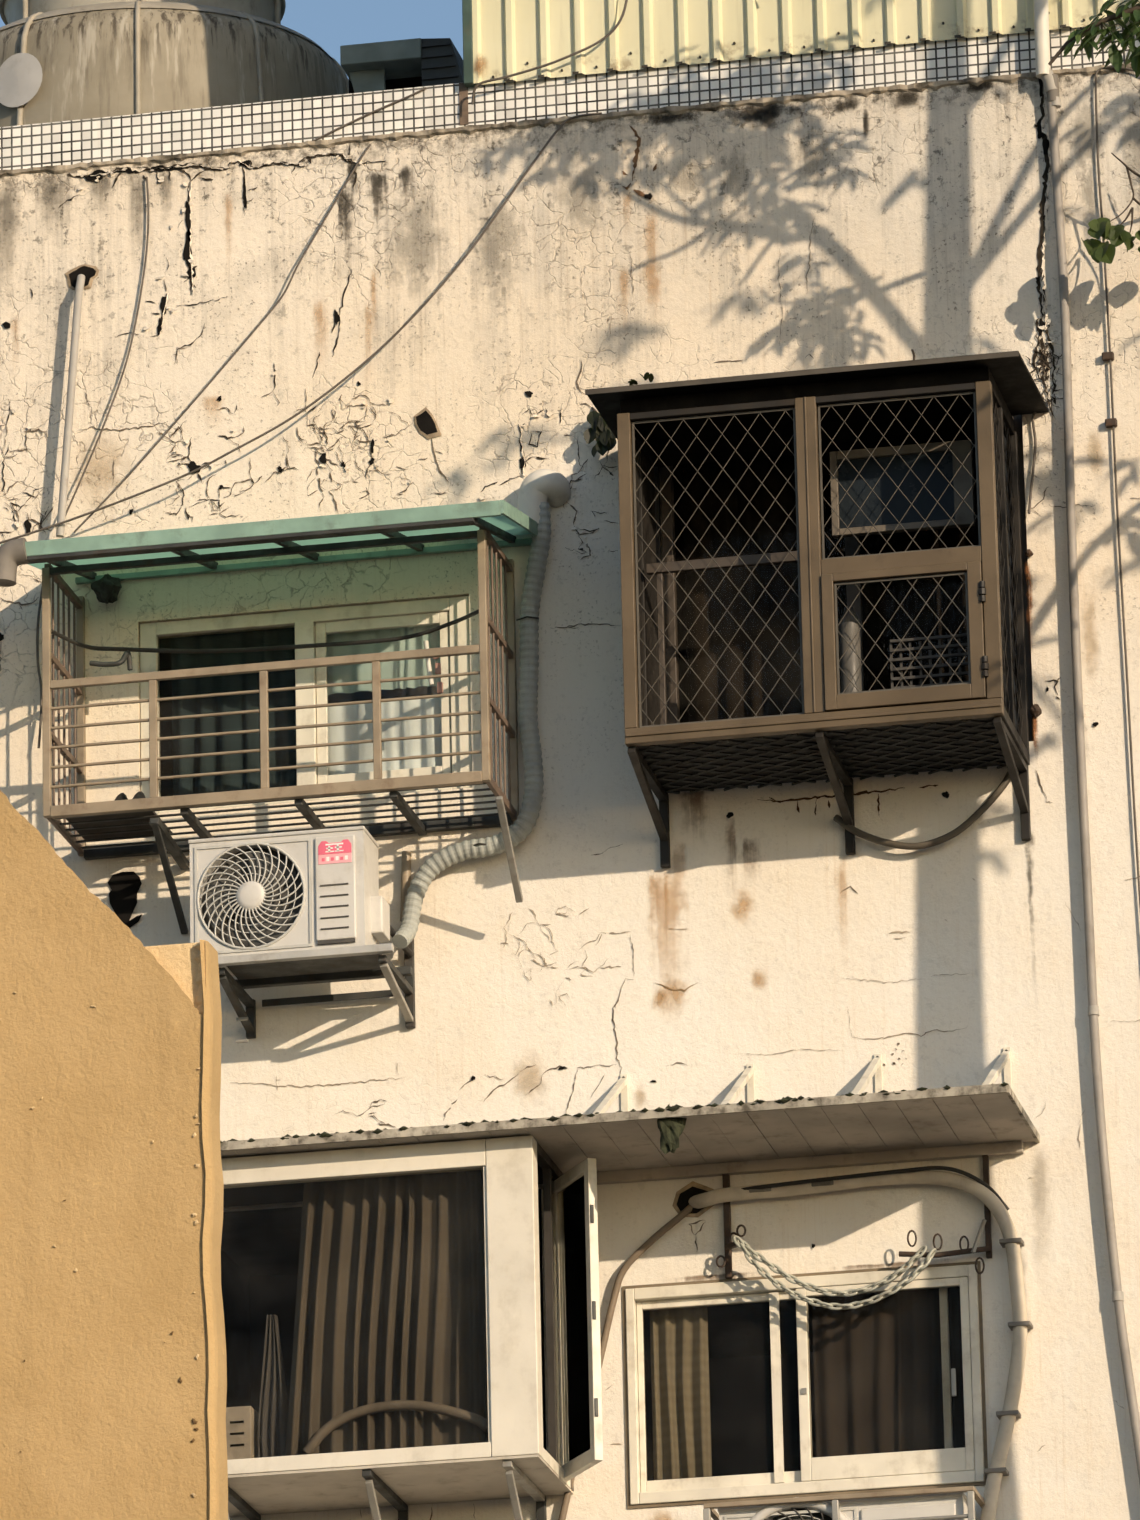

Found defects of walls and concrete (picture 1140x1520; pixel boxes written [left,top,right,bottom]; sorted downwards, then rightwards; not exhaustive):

water stain [651,113,688,123]
water stain [740,104,794,127]
water stain [835,101,868,134]
water stain [896,93,918,105]
water stain [968,82,992,91]
crack [59,146,385,364]
crack [1012,78,1075,423]
crack [0,270,620,560]
crack [0,578,40,671]
crack [557,622,621,630]
crack [444,906,697,1119]